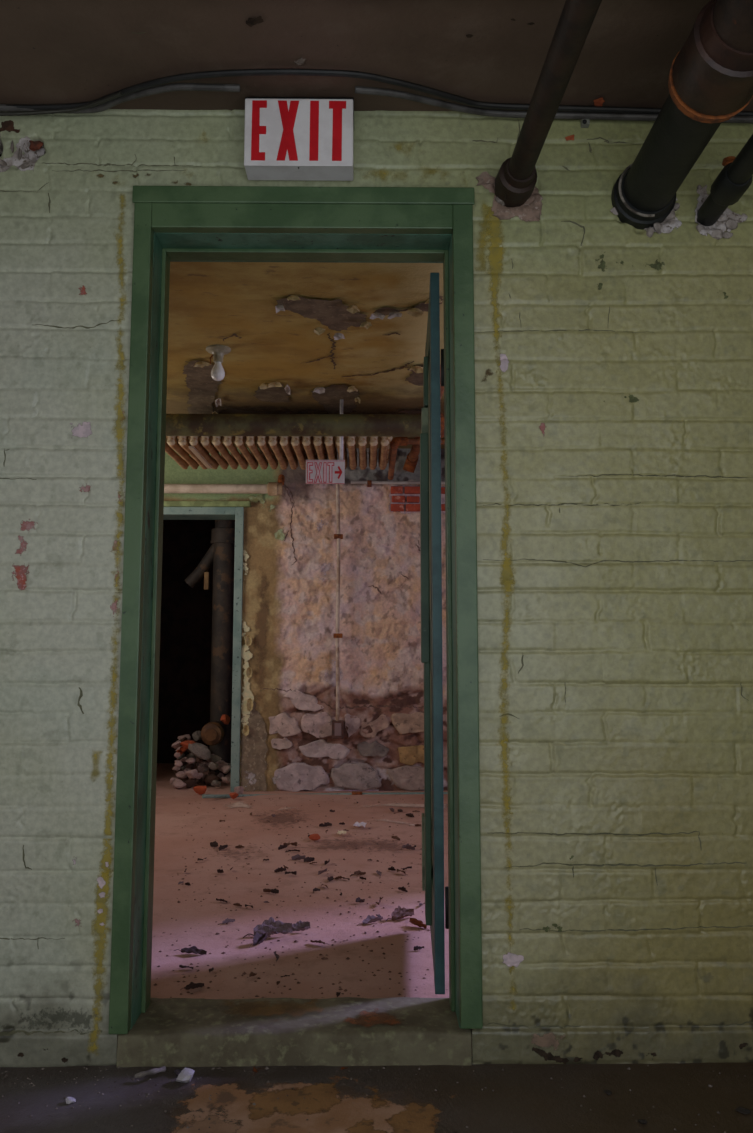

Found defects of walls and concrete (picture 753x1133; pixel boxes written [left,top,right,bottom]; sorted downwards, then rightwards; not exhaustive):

spalling [0,134,45,172]
spalling [476,172,543,222]
spalling [644,185,748,240]
peeling [275,295,443,340]
water stain [114,195,126,613]
peeling [12,520,35,590]
water stain [20,631,119,1052]
peeling [171,1074,441,1133]